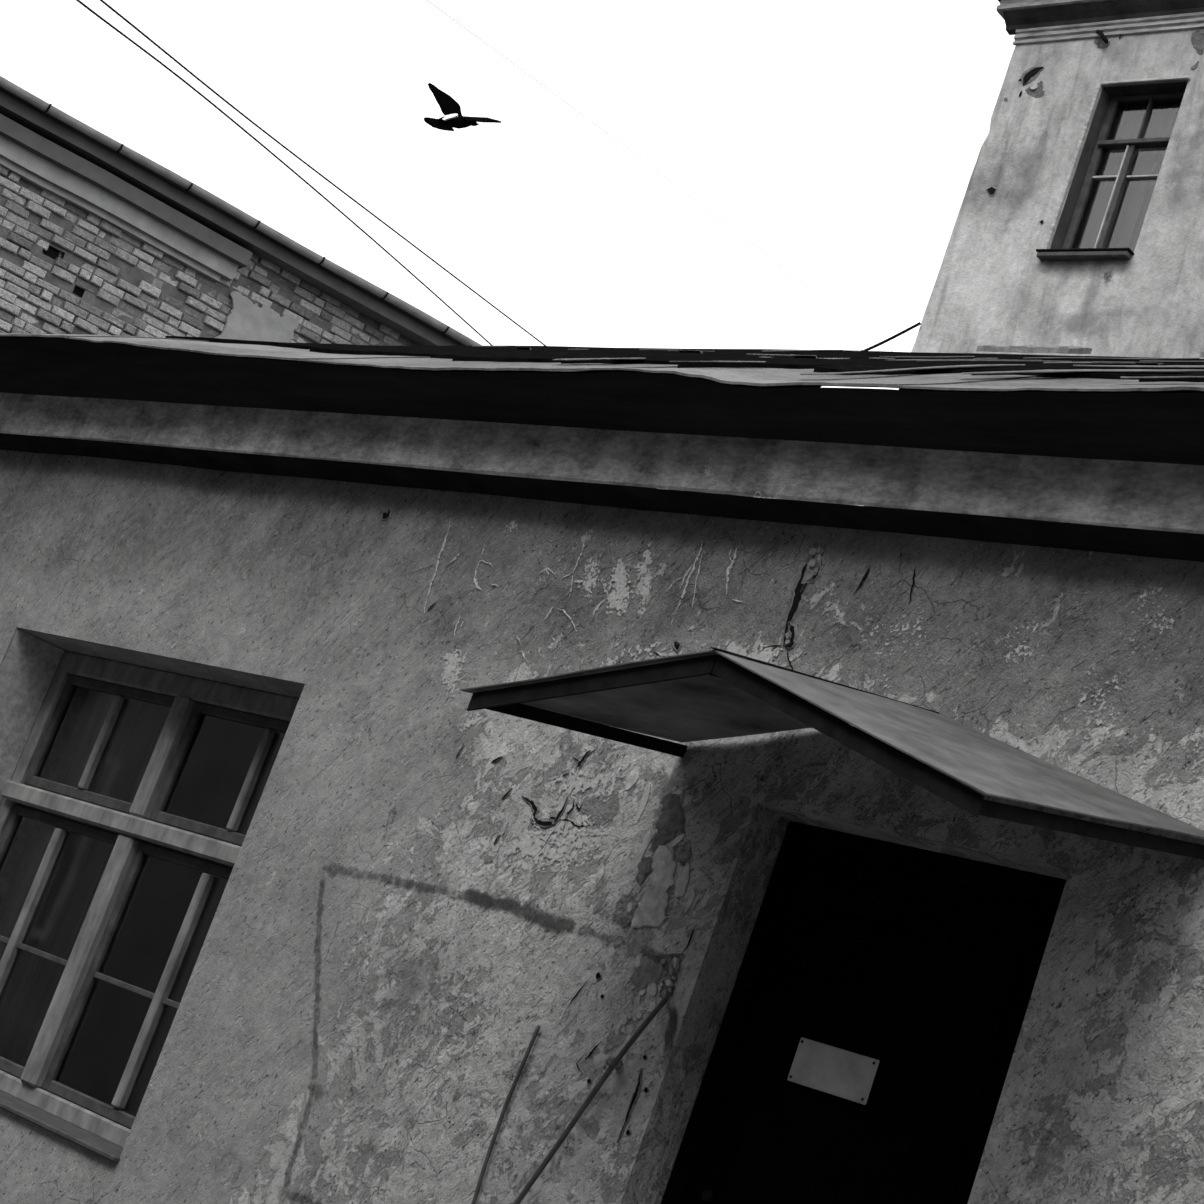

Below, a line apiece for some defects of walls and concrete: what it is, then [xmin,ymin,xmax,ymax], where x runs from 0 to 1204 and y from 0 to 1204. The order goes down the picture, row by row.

spalling [1004,66,1045,101]
peeling [1191,28,1204,70]
crack [409,513,499,621]
crack [514,532,609,659]
crack [662,540,742,630]
crack [764,542,826,670]
crack [522,749,596,858]
peeling [493,761,696,929]
peeling [630,953,685,1000]